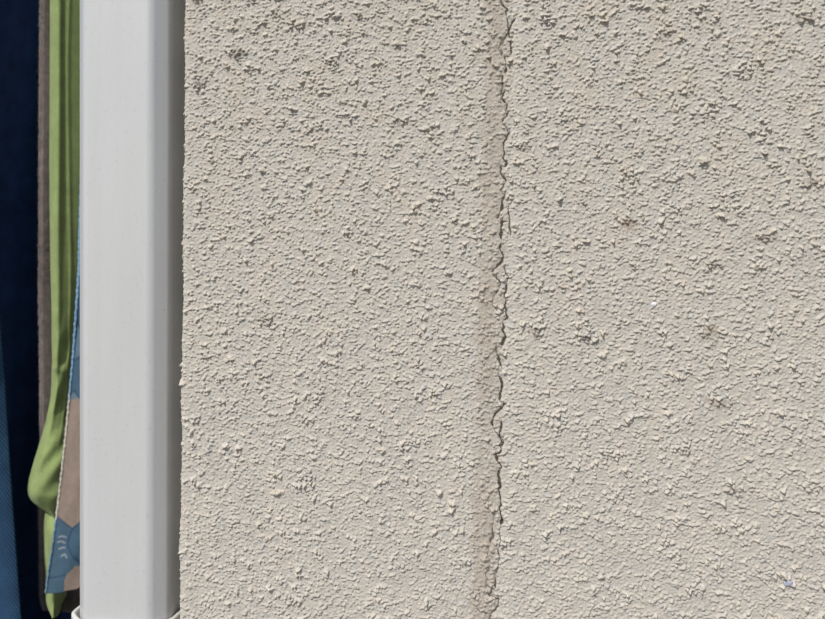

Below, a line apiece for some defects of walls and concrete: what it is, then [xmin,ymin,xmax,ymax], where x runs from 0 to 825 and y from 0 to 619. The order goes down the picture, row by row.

crack [477,0,516,619]